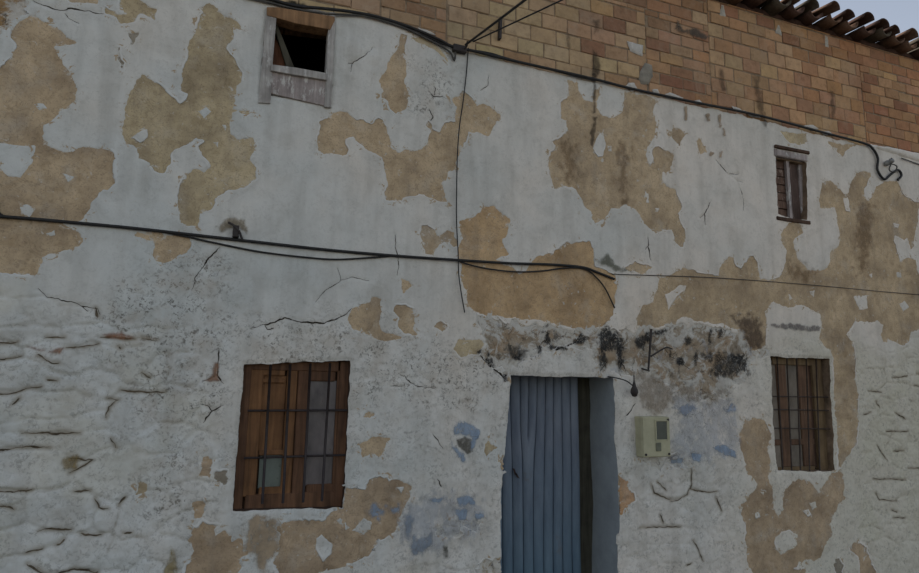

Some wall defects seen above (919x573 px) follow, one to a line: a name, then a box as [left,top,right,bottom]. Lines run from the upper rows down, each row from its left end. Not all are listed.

peeling [0,0,118,278]
peeling [122,3,259,226]
peeling [316,32,501,203]
damp [590,52,600,145]
peeling [547,80,686,249]
peeling [134,232,194,263]
crack [255,308,352,330]
damp [599,347,624,371]
peeling [418,171,919,573]
peeling [199,456,229,485]
peeling [182,501,248,573]
peeling [270,475,412,573]